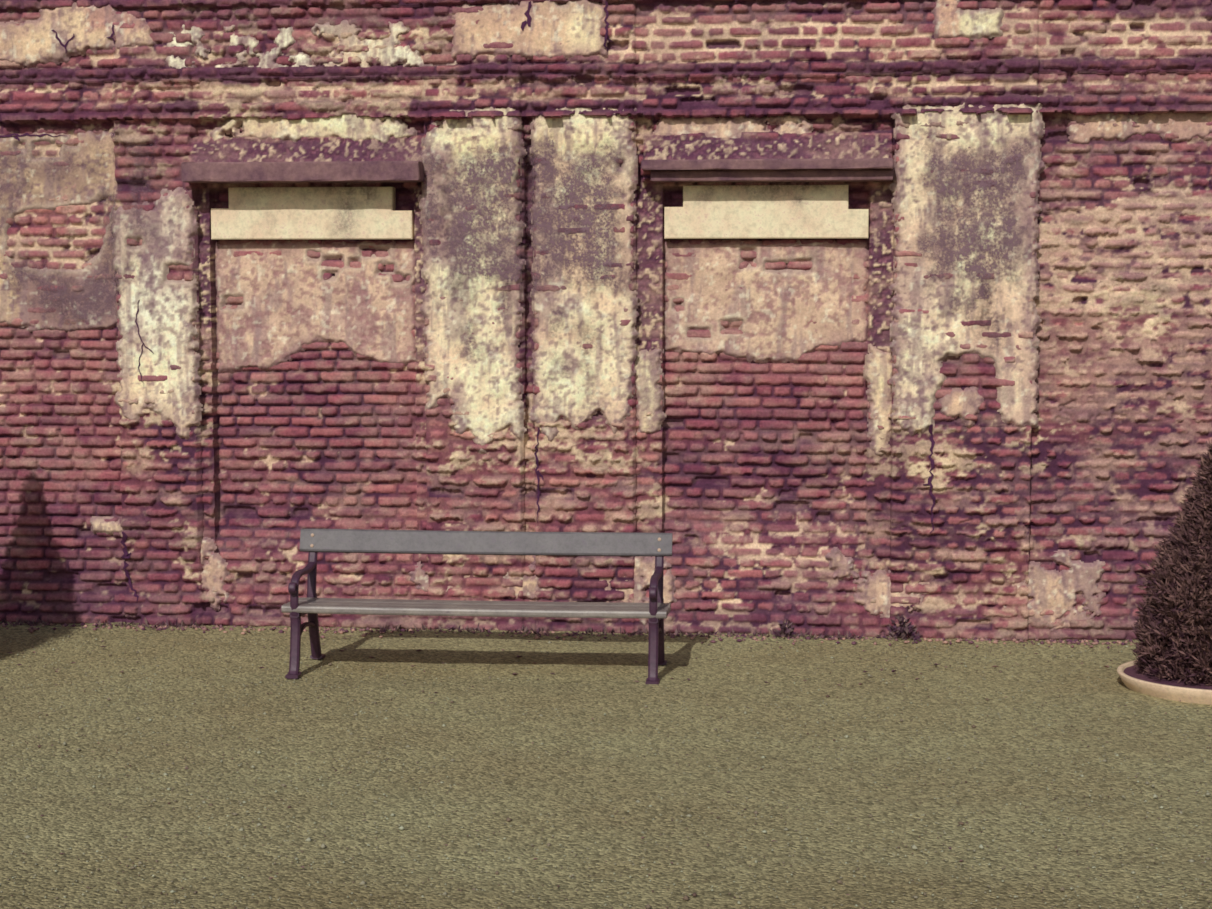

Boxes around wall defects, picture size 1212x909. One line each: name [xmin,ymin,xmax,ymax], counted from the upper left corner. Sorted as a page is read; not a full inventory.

flaking render [0,0,609,69]
crack [521,1,532,31]
flaking render [1067,112,1212,144]
flaking render [0,130,203,439]
flaking render [210,96,1046,456]
crack [135,300,154,379]